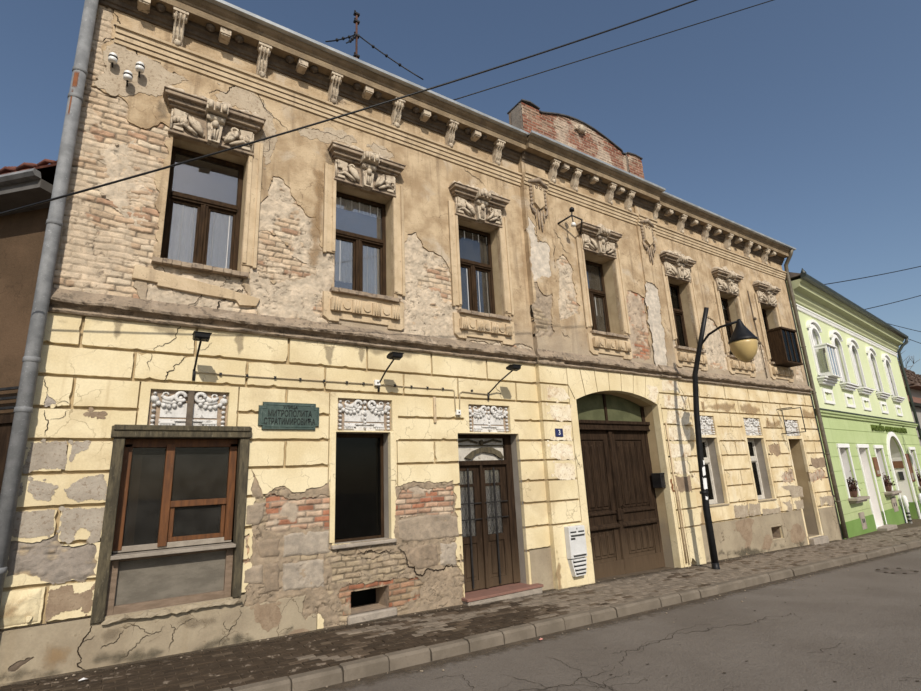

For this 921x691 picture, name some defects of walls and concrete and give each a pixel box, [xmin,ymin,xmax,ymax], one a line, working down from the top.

flaking render [52,4,341,325]
crack [147,268,245,381]
flaking render [397,232,532,349]
flaking render [526,217,579,320]
flaking render [626,282,694,493]
flaking render [6,438,107,622]
flaking render [242,472,464,635]
crack [77,618,193,670]